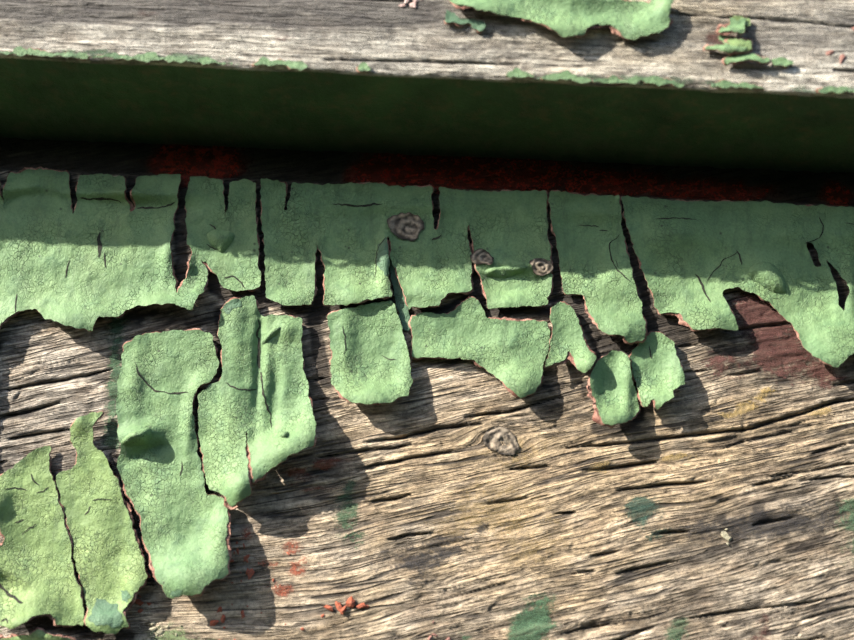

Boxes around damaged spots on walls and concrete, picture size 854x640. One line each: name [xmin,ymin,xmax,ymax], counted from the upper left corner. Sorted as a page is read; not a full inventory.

peeling [444,0,673,41]
peeling [703,15,794,68]
peeling [710,79,764,91]
crack [227,319,272,428]
peeling [0,167,854,640]